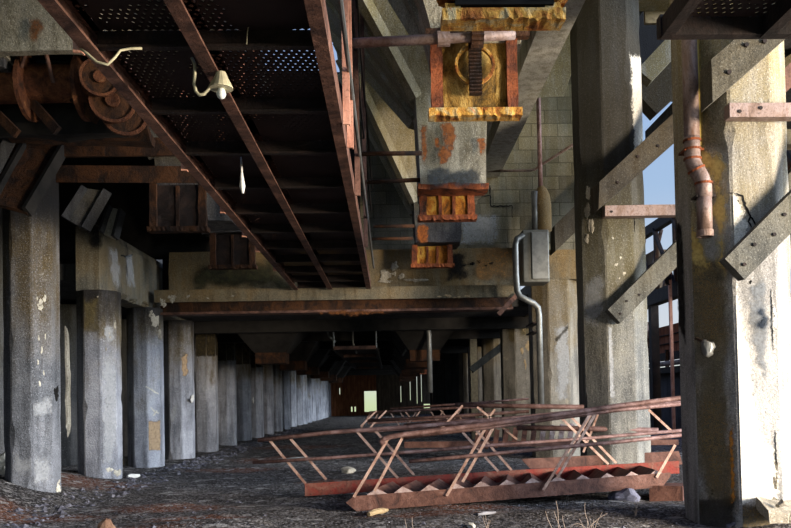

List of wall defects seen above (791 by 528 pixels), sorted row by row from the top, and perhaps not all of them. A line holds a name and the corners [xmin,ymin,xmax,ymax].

corrosion [420,122,456,164]
crack [728,192,756,228]
damp [448,253,468,281]
damp [675,94,779,528]